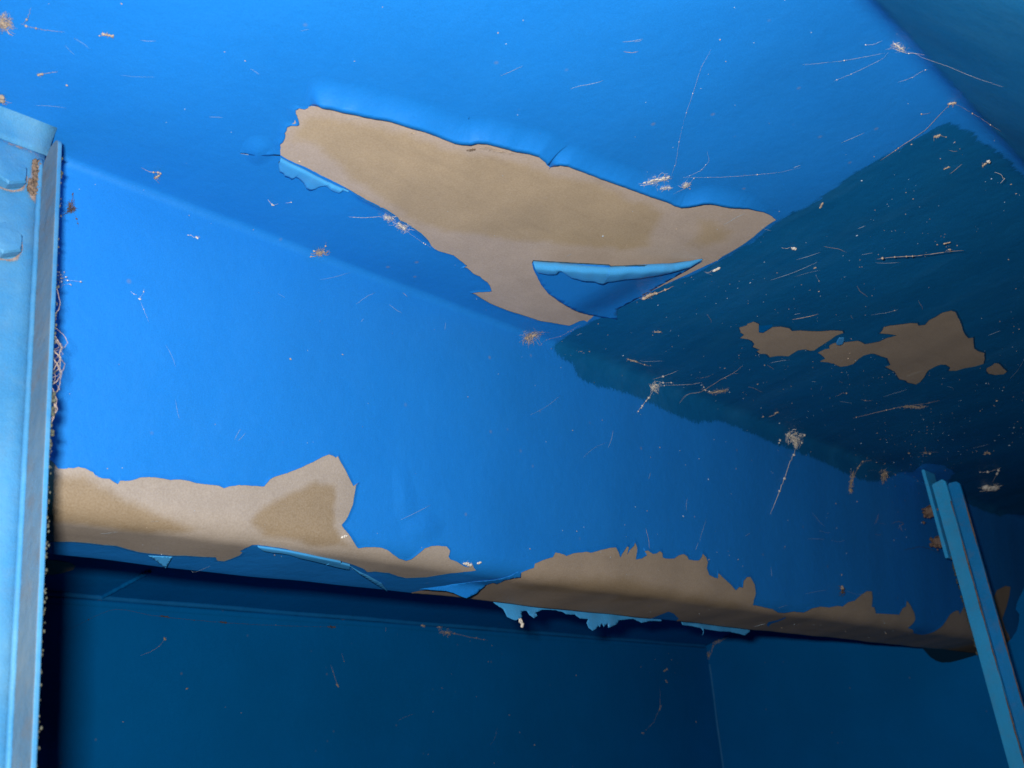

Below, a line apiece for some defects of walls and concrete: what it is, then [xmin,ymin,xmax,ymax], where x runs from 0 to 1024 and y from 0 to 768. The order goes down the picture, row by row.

peeling [272,77,783,327]
spalling [738,309,1008,385]
spalling [45,451,977,653]
spalling [993,584,1011,643]